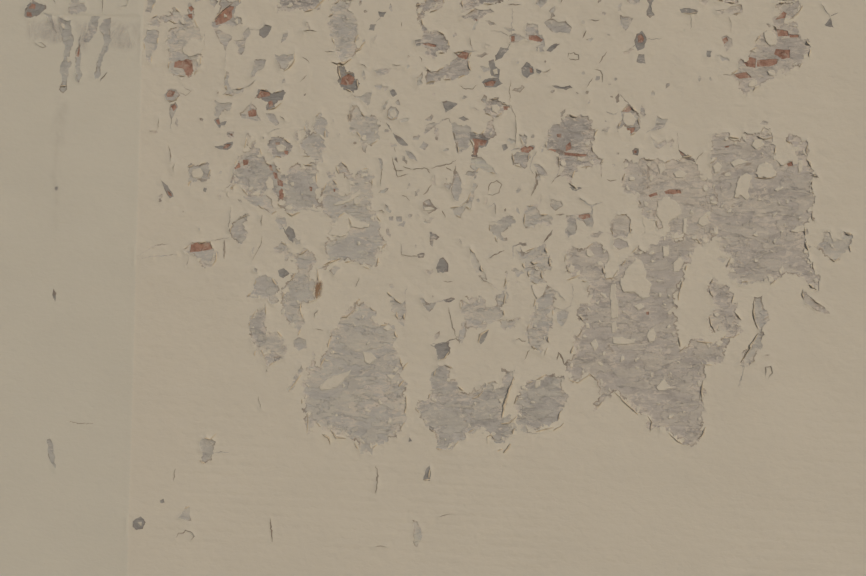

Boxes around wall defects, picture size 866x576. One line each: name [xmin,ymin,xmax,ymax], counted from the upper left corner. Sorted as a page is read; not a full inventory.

peeling [24,0,111,93]
peeling [136,0,853,455]
peeling [199,434,229,464]